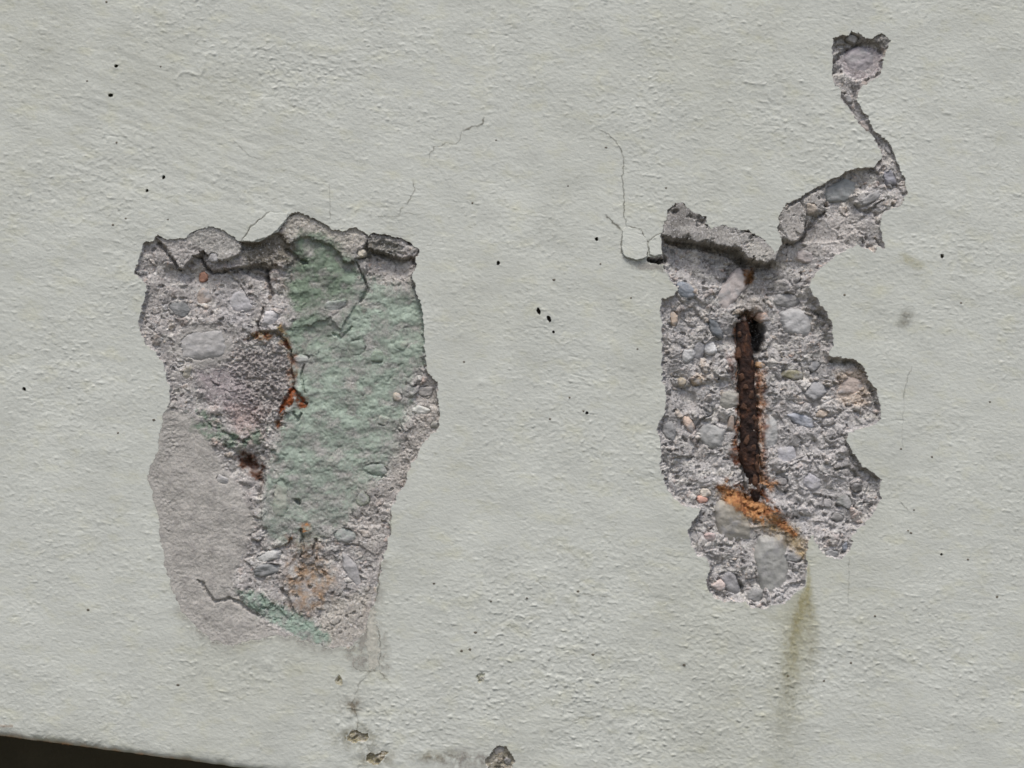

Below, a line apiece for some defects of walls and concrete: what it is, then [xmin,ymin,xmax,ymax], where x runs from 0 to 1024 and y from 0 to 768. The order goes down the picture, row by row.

spalling [831,31,891,94]
corrosion [251,325,308,428]
spalling [134,212,440,669]
corrosion [716,374,798,537]
spalling [622,158,908,609]